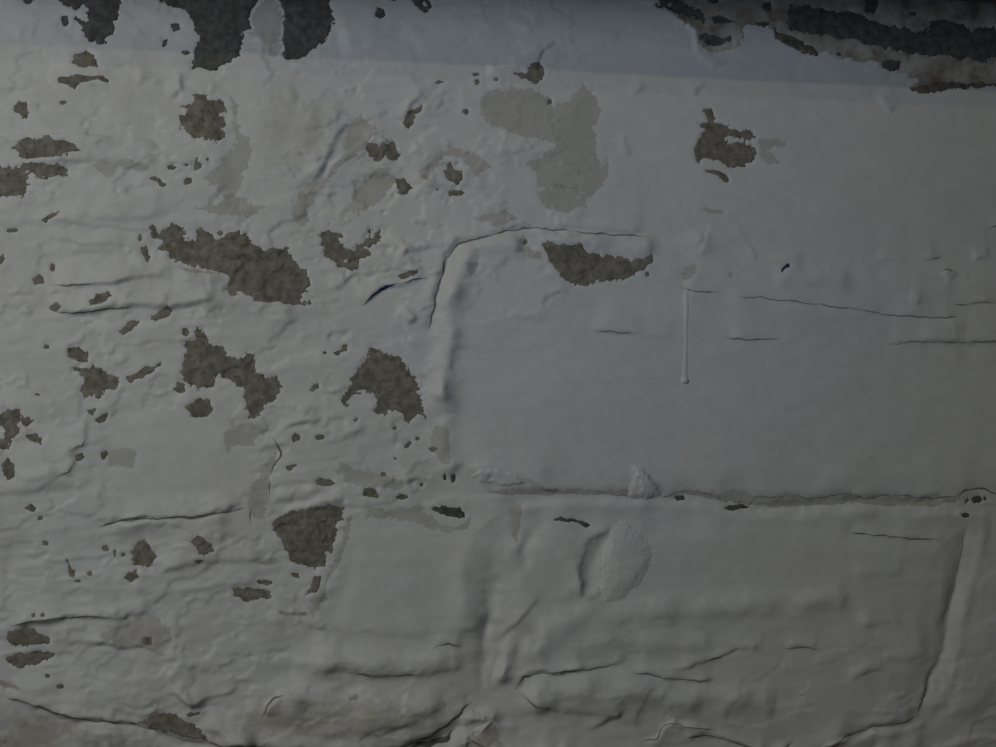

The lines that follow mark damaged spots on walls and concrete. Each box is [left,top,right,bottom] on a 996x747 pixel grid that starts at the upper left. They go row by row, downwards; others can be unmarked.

flaking render [159,0,258,71]
flaking render [278,0,335,60]
peeling [654,0,996,89]
flaking render [138,223,313,306]
crack [429,227,647,327]
crack [743,296,994,344]
flaking render [174,327,282,419]
flaking render [272,504,345,595]
crack [10,615,114,626]
crack [8,698,141,726]
crack [411,702,484,747]
crack [514,664,612,712]